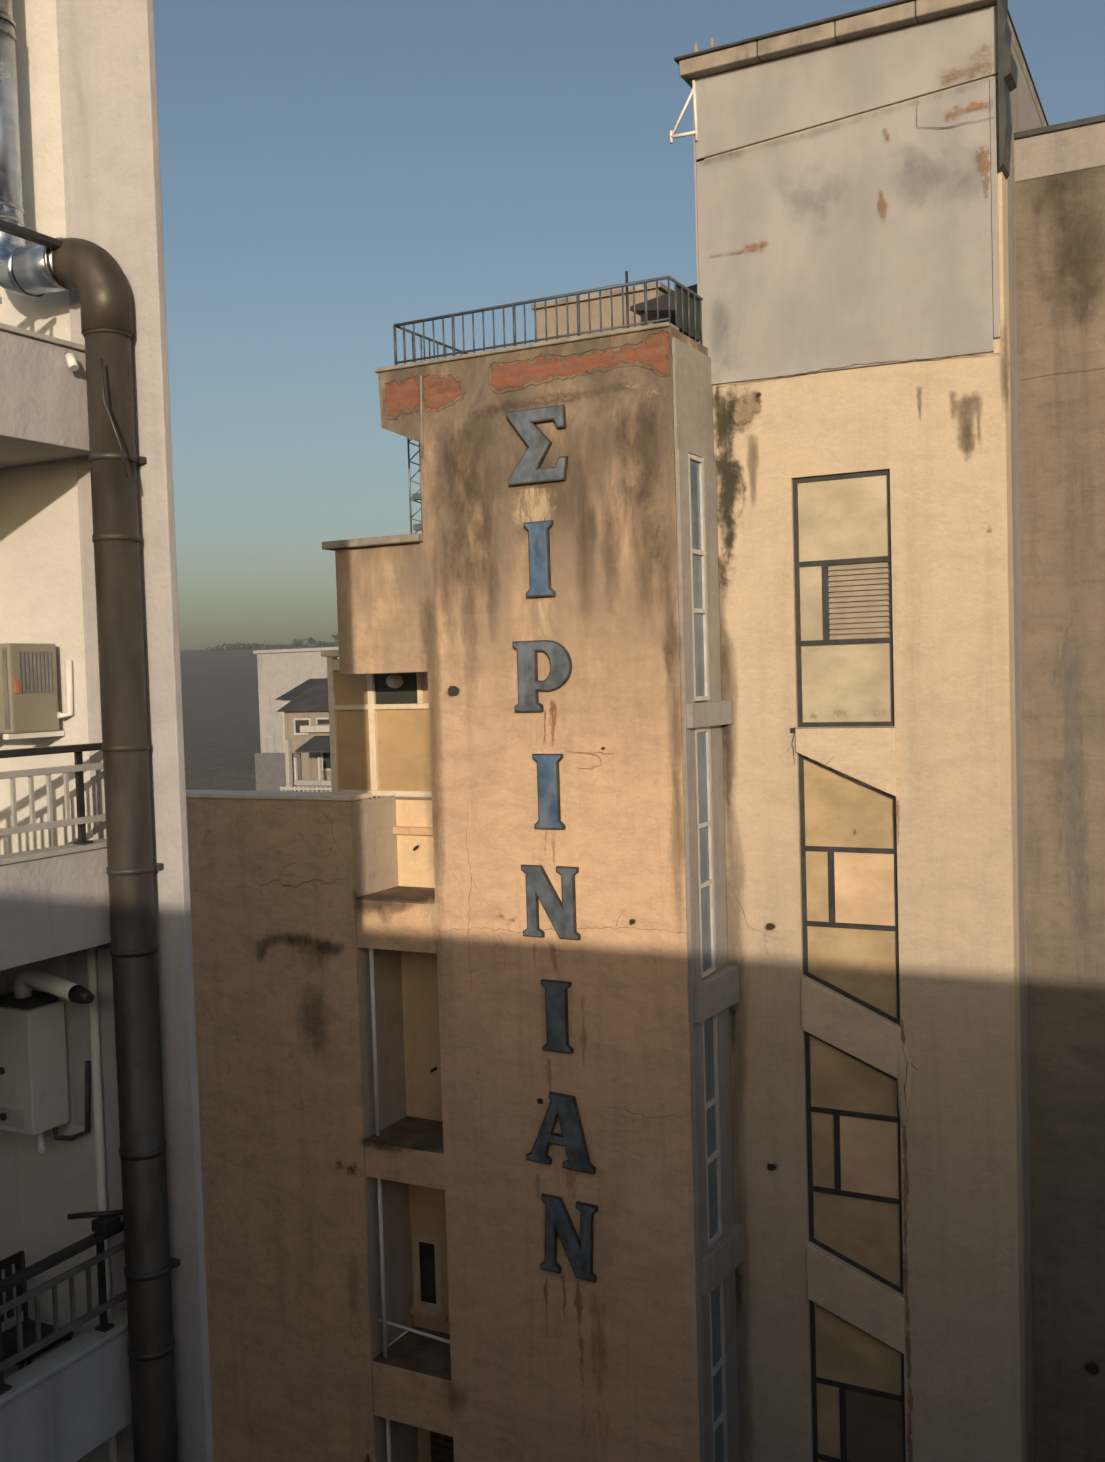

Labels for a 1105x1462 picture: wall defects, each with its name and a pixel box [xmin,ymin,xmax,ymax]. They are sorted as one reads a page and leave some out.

flaking render [488,327,673,398]
flaking render [382,372,466,420]
damp [963,400,971,450]
damp [517,489,548,522]
damp [712,389,761,585]